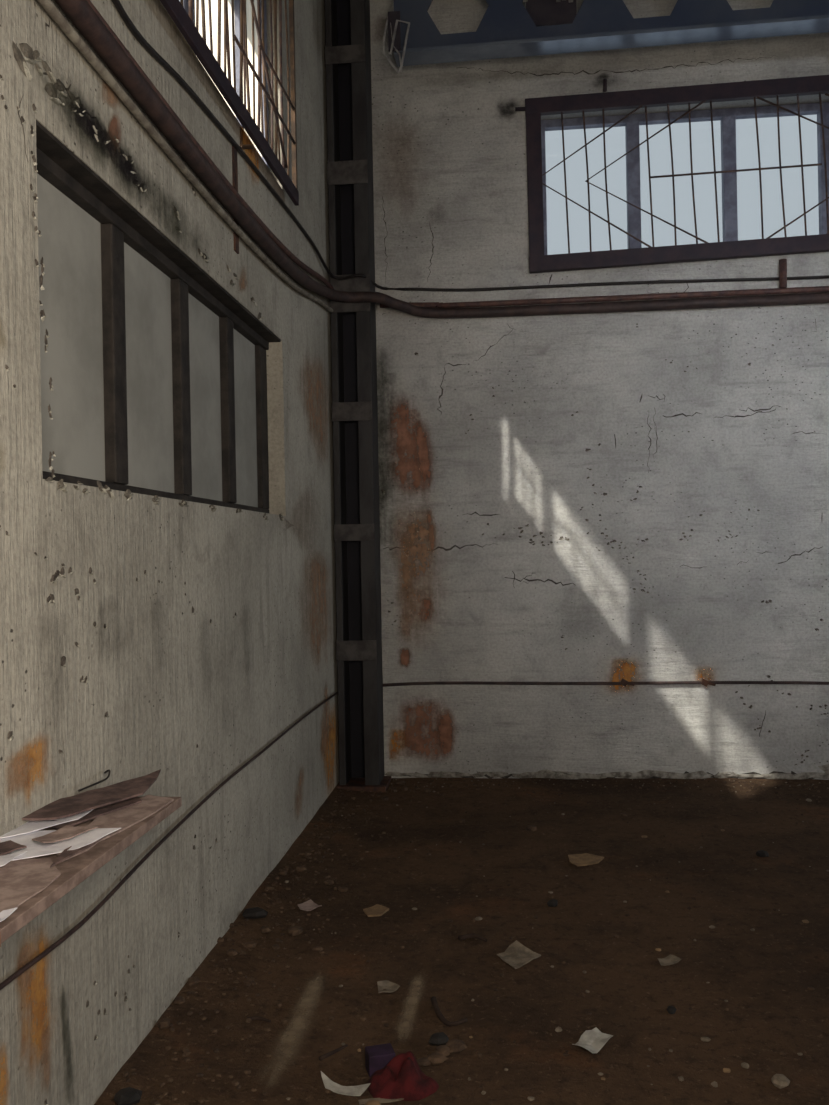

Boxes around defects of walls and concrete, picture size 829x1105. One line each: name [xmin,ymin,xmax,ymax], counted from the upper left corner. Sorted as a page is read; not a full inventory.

water stain [59,89,148,194]
crack [437,325,513,414]
corrosion [390,401,431,492]
crack [640,394,780,473]
crack [505,571,575,588]
crack [737,547,822,565]
corrosion [610,661,636,690]
corrosion [390,702,454,758]